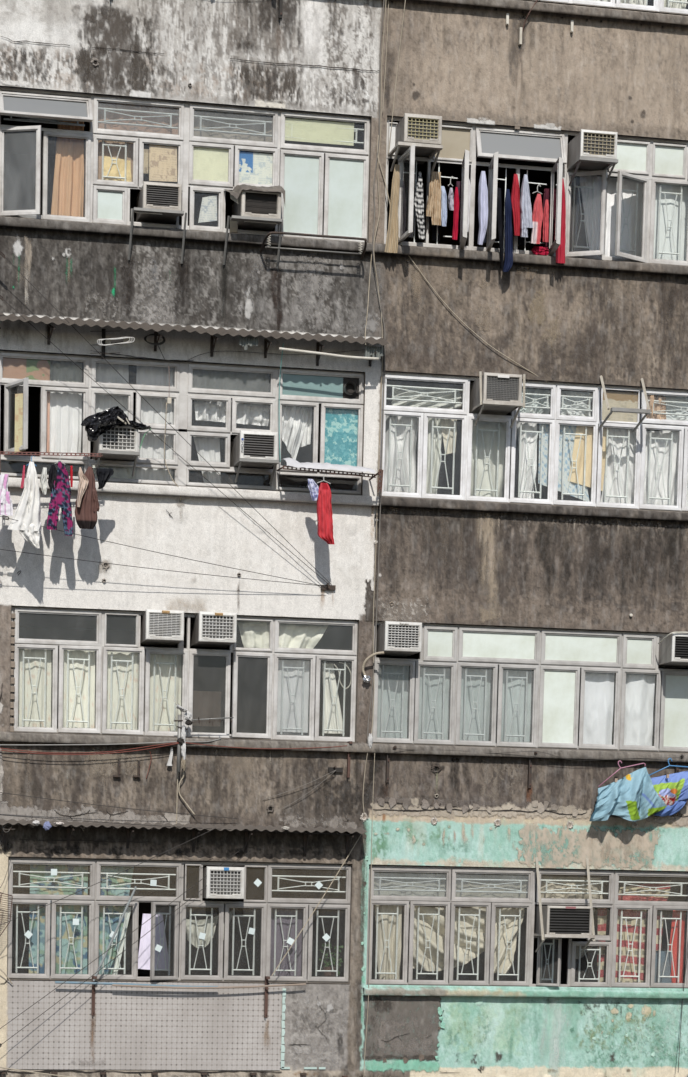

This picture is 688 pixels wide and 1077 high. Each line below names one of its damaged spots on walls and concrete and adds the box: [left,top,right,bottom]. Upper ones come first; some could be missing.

leakage [0,50,46,87]
leakage [74,6,171,98]
leakage [233,62,301,109]
leakage [244,0,300,44]
leakage [326,70,368,103]
leakage [13,238,32,300]
leakage [86,254,188,323]
leakage [238,286,256,318]
leakage [478,514,500,622]
spalling [0,746,190,853]
peeling [266,794,688,914]
peeling [586,1004,688,1066]